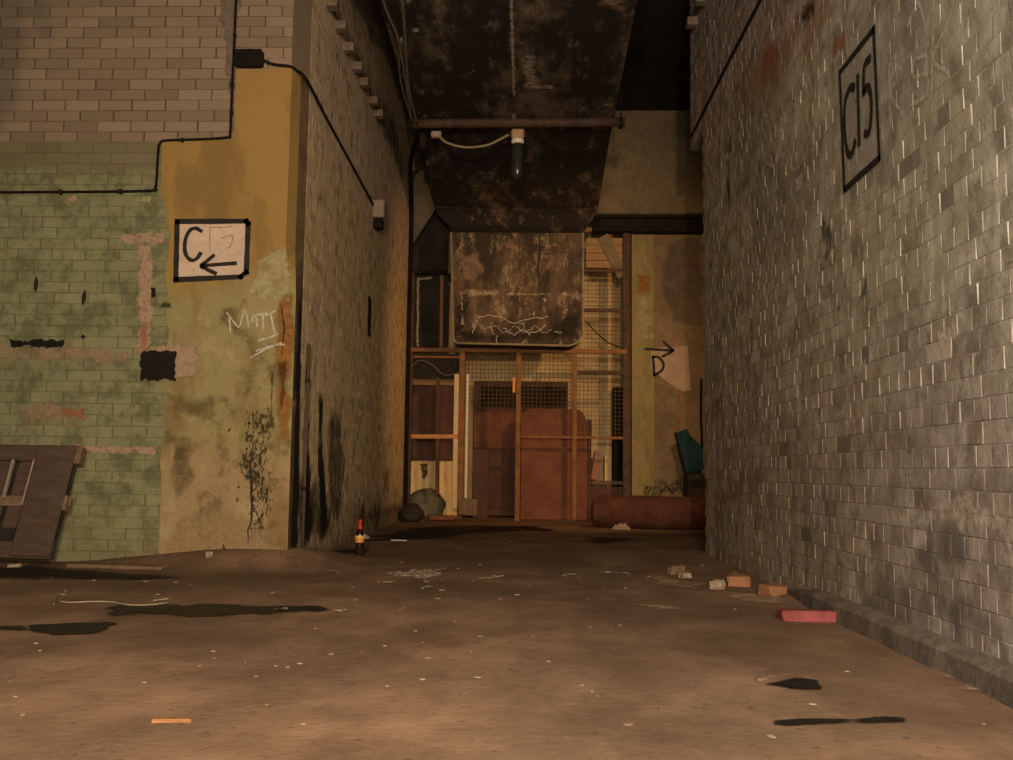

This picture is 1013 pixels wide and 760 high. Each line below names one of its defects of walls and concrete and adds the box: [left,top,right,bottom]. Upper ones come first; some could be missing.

peeling [37,232,199,377]
rust [270,294,295,439]
water stain [236,407,277,537]